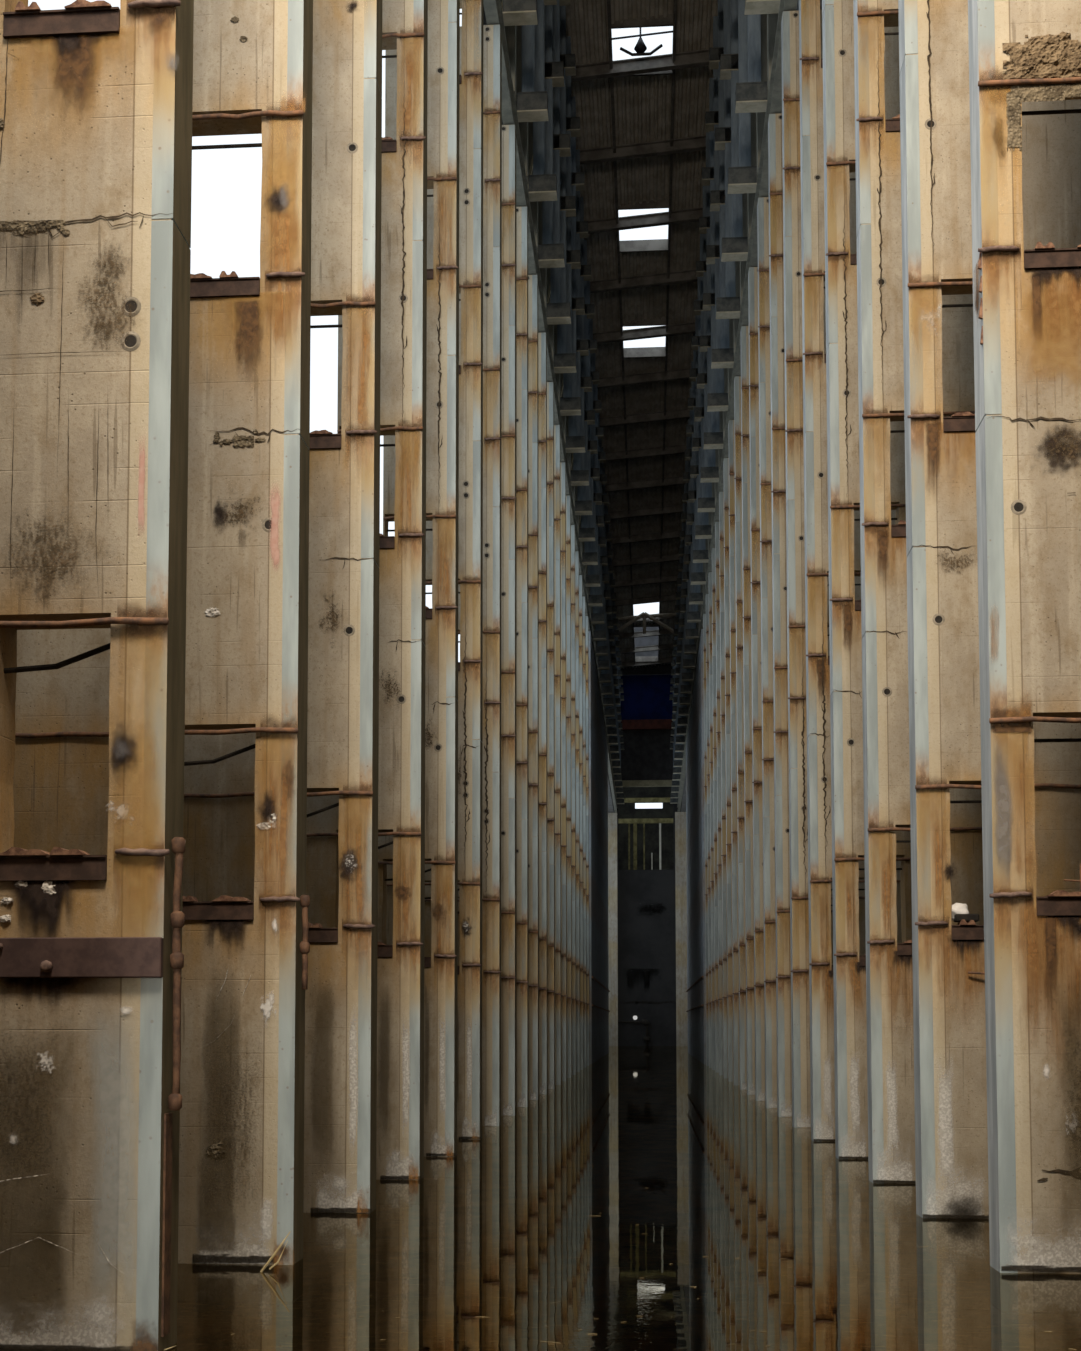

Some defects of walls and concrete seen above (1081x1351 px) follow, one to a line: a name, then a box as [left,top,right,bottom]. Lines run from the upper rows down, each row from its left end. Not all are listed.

crack [0,7,19,162]
crack [926,0,935,270]
crack [12,212,172,237]
rust [230,162,301,364]
water stain [6,232,64,372]
crack [207,427,300,450]
crack [987,416,1081,428]
crack [1037,1167,1081,1181]
water stain [1002,1235,1081,1272]
water stain [0,1305,132,1351]